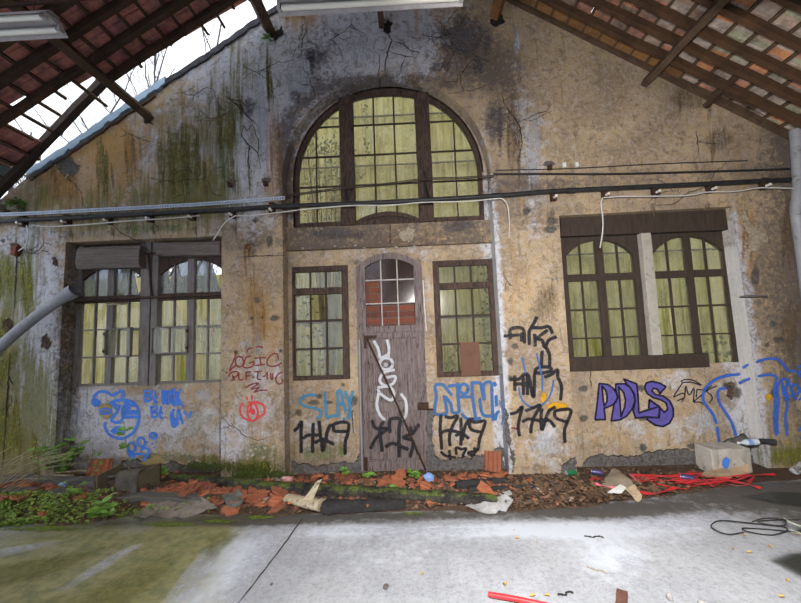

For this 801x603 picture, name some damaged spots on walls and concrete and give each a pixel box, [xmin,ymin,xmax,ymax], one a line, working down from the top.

crack [243,21,365,100]
crack [378,8,490,94]
crack [182,86,261,173]
leakage [236,62,280,174]
crack [489,95,551,162]
crack [0,349,13,467]